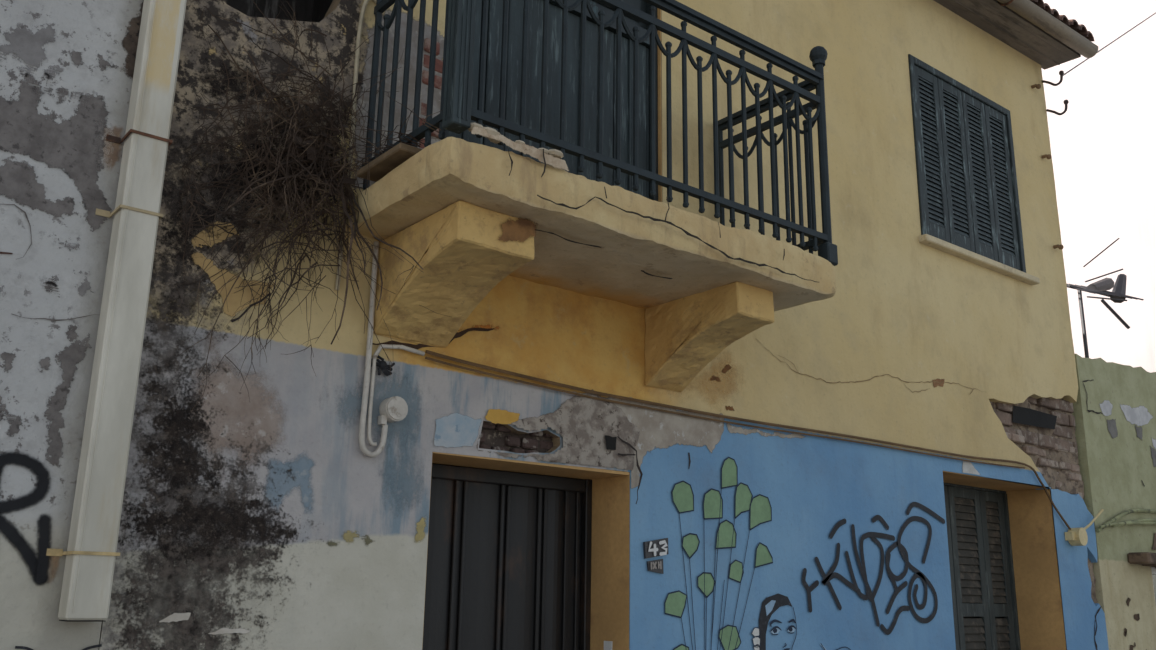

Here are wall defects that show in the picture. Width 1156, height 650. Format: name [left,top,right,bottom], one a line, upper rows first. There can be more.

peeling [0,23,119,250]
leakage [185,53,278,119]
crack [536,149,817,282]
peeling [43,276,60,297]
peeling [73,270,93,296]
peeling [0,322,92,466]
leakage [109,126,313,650]
peeling [340,377,423,505]
flaking render [477,389,805,489]
crack [765,348,987,395]
flaking render [990,396,1084,499]
peeling [1100,400,1156,467]